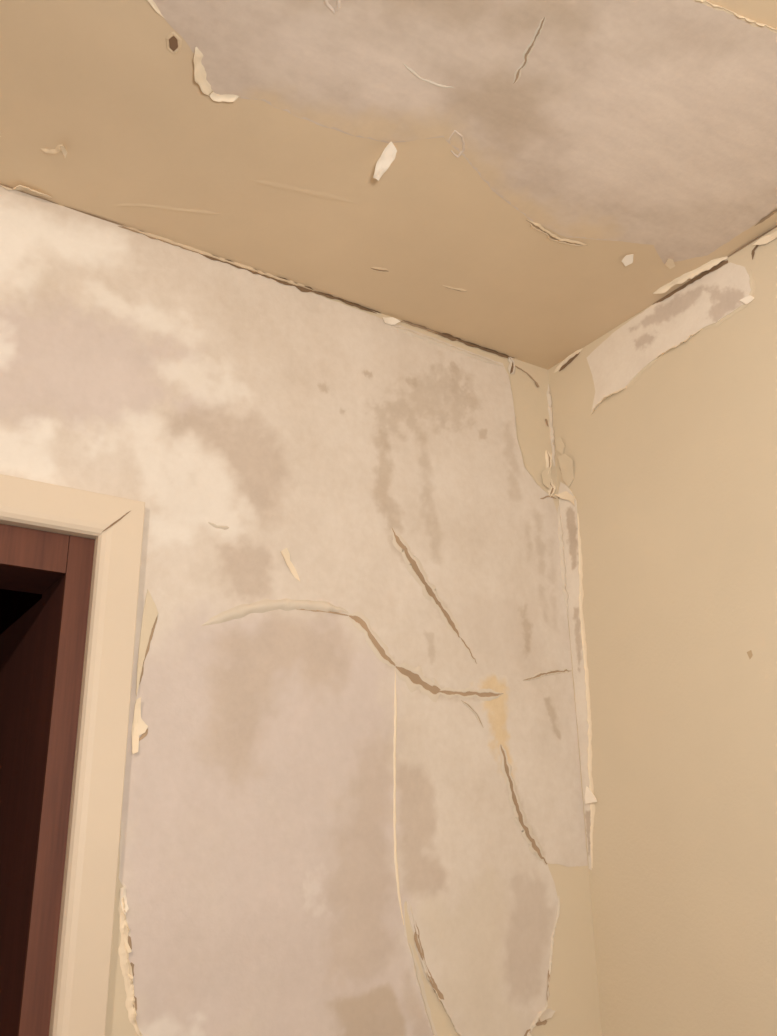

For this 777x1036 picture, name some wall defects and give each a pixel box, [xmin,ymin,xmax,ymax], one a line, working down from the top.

peeling [373,142,397,181]
peeling [587,262,755,415]
leakage [339,347,583,694]
leakage [0,288,451,1036]
crack [201,527,572,727]
crack [499,744,548,865]
leakage [504,864,558,1009]